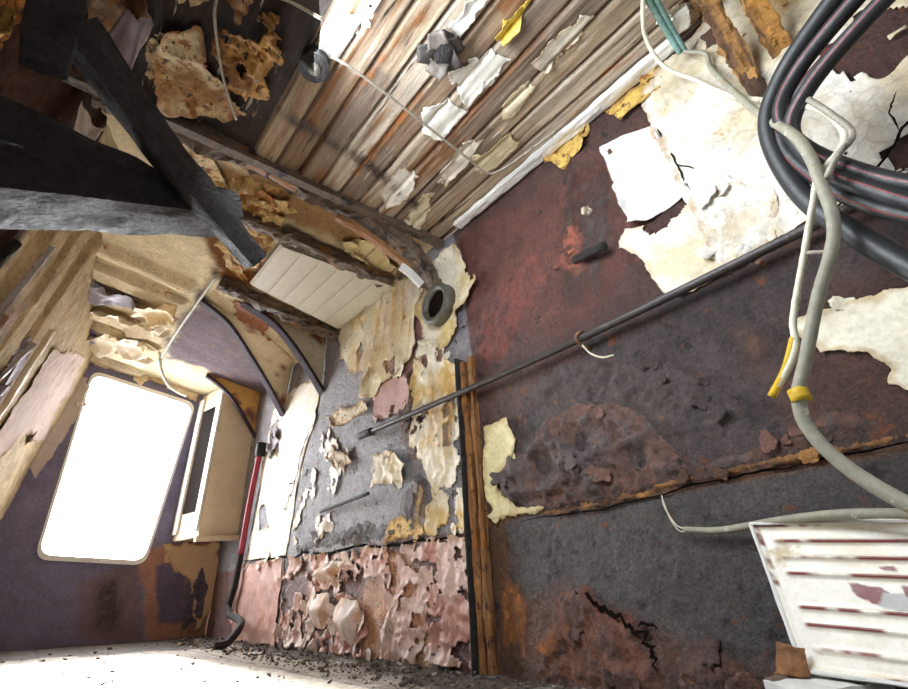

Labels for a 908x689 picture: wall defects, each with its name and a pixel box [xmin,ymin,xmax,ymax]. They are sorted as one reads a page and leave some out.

peeling [421,0,536,141]
peeling [599,2,807,293]
peeling [801,55,908,173]
crack [877,93,908,172]
peeling [816,287,908,390]
peeling [229,238,476,670]
corrosion [489,350,823,515]
crack [520,441,908,522]
corrosion [814,411,908,453]
corrosion [182,568,208,629]
corrosion [535,583,765,689]
corrosion [774,642,811,678]